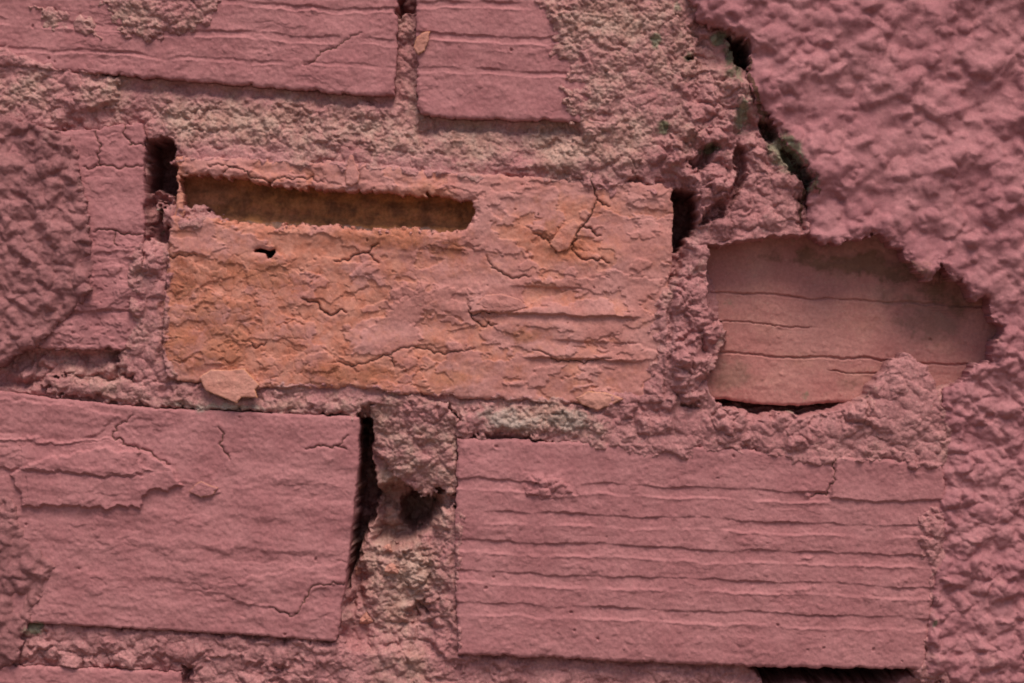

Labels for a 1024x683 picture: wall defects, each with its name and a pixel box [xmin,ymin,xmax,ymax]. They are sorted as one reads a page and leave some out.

spalling [414,31,430,55]
crack [735,51,822,224]
spalling [178,155,475,235]
crack [535,173,609,263]
peeling [550,219,580,252]
crack [334,244,377,262]
peeling [476,294,528,312]
crack [338,306,497,367]
crack [533,350,608,364]
spalling [576,391,622,410]
peeling [19,440,218,510]